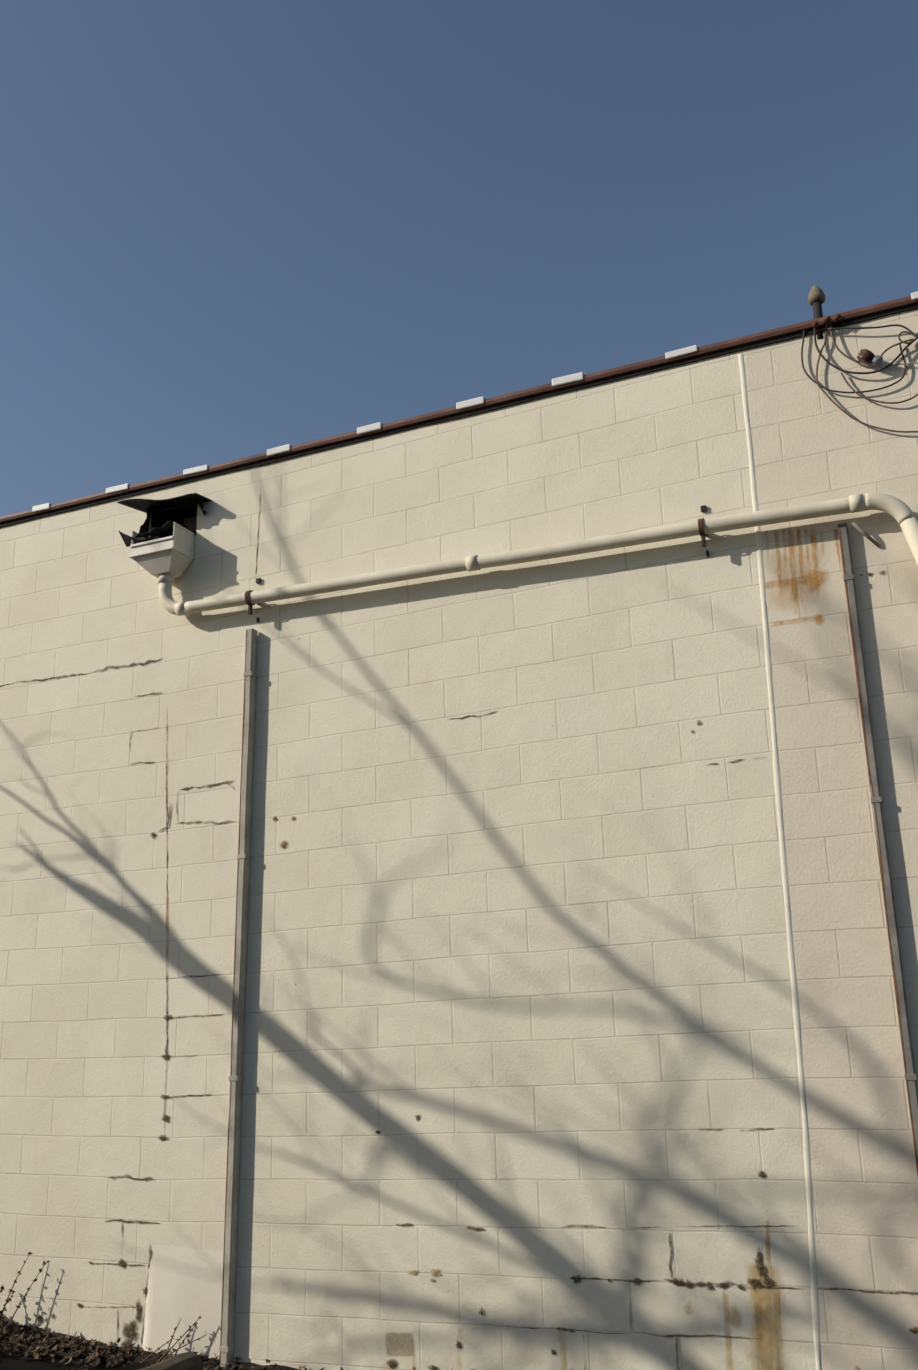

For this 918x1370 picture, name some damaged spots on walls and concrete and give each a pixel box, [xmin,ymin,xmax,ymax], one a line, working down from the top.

rust [777,530,822,597]
crack [0,659,161,697]
crack [129,727,234,926]
rust [835,524,918,1175]
crack [166,974,222,1056]
crack [161,1094,211,1139]
crack [702,1222,786,1230]
crack [506,1227,918,1369]